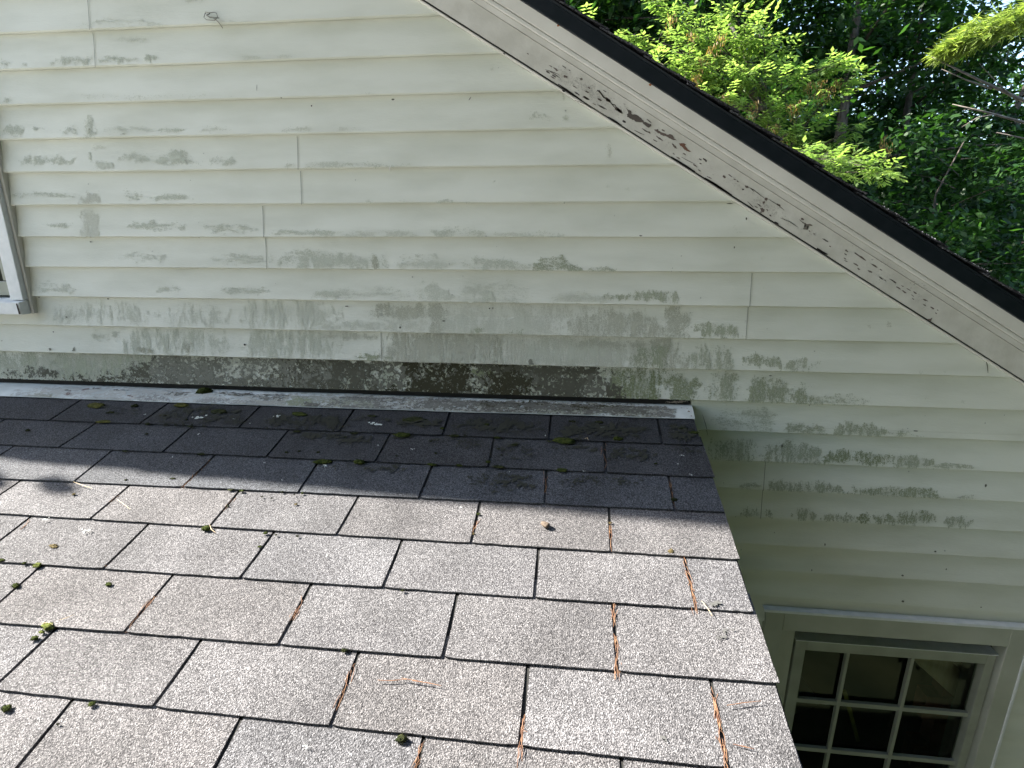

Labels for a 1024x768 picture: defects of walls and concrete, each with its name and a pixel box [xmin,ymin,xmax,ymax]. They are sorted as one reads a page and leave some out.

peeling [546,65,749,190]
damp [1,249,676,418]
peeling [844,250,938,321]